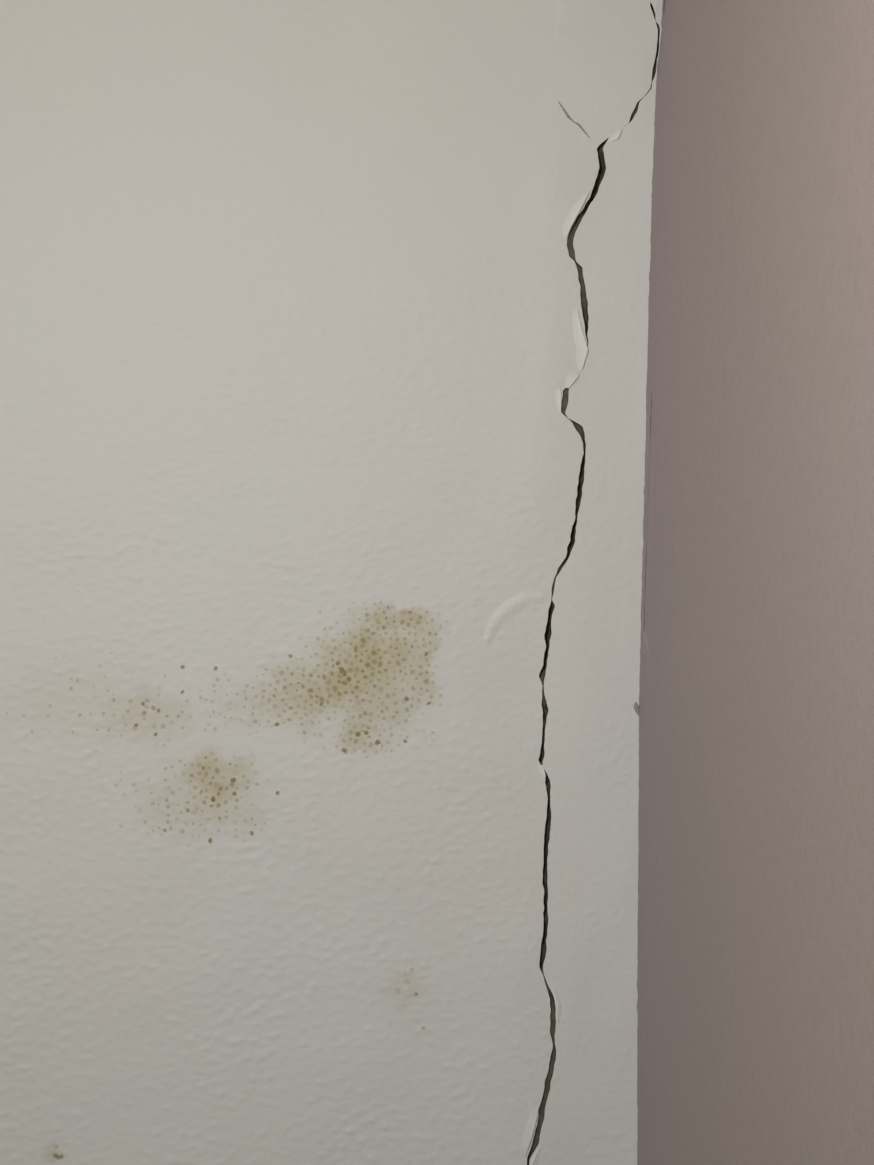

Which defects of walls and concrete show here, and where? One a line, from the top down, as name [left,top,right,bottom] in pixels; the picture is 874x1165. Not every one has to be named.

crack [519,0,665,1165]